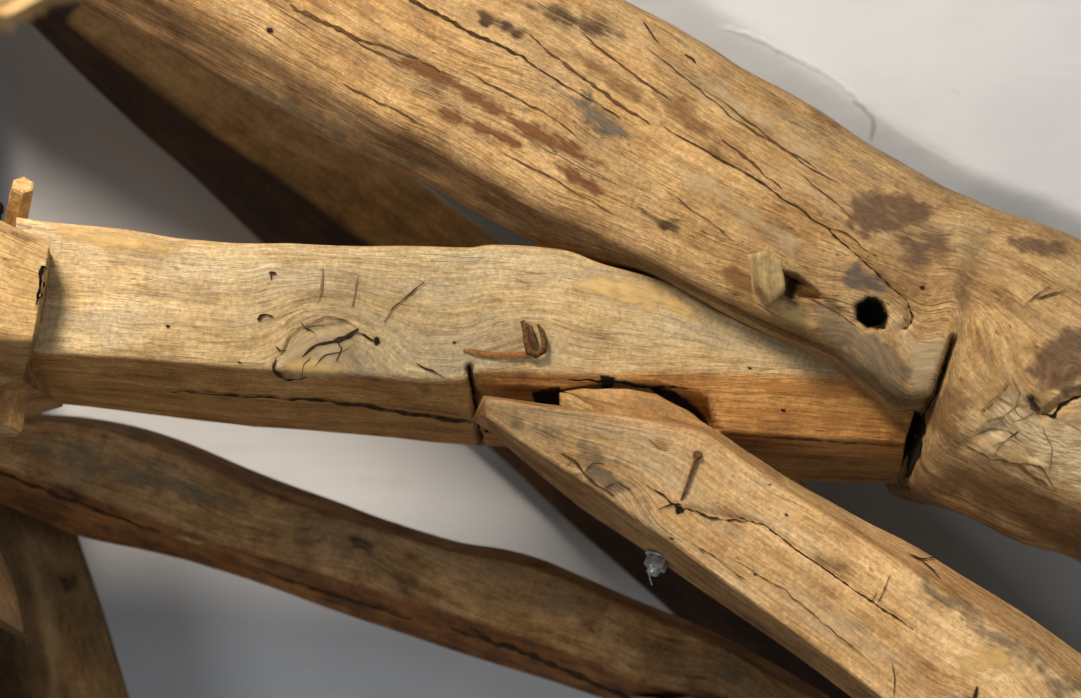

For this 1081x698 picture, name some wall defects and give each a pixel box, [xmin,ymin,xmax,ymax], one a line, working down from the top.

crack [290,4,586,143]
crack [409,0,913,329]
crack [164,323,471,423]
crack [965,378,1081,489]
crack [562,453,913,630]
crack [695,545,895,698]